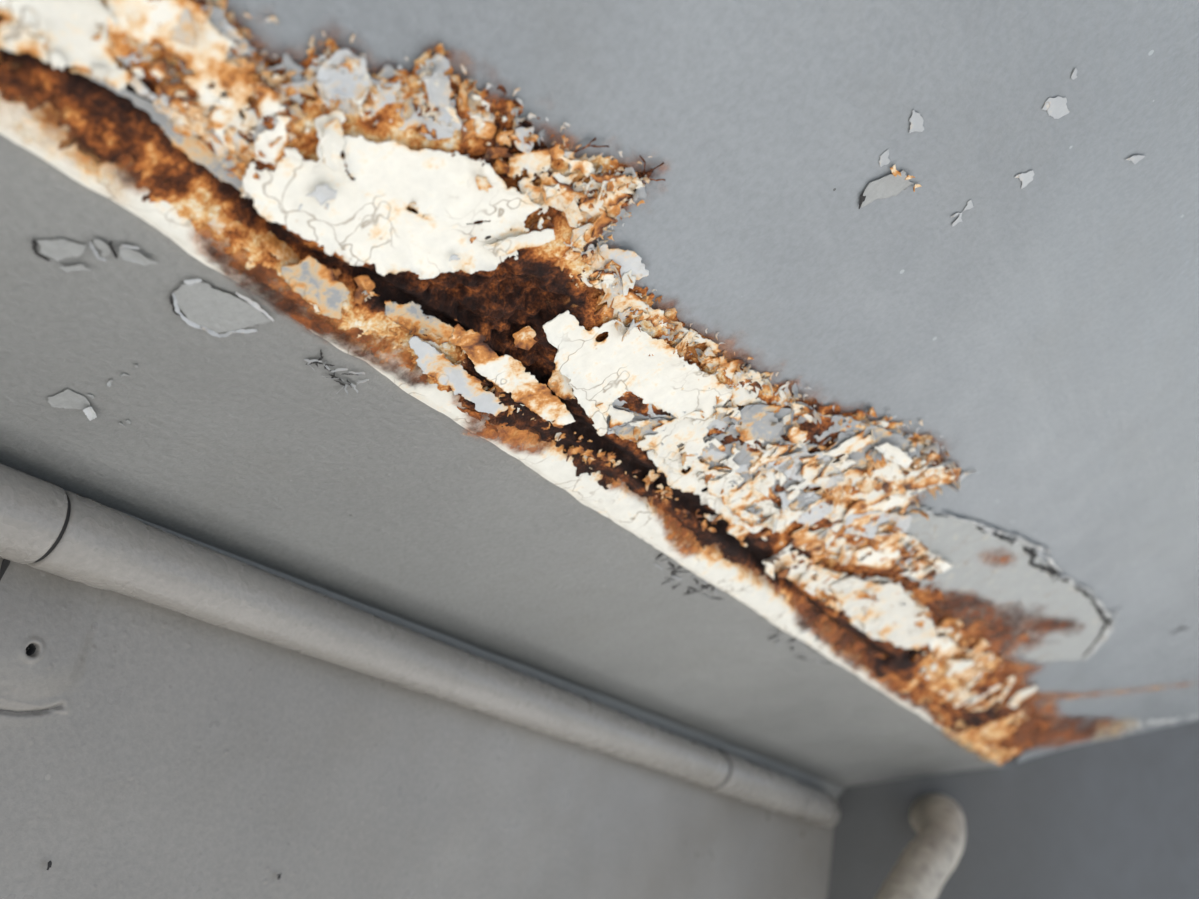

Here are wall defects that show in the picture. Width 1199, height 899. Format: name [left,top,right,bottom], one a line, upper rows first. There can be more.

corrosion [223,11,256,48]
peeling [0,0,1124,711]
corrosion [0,38,1132,766]